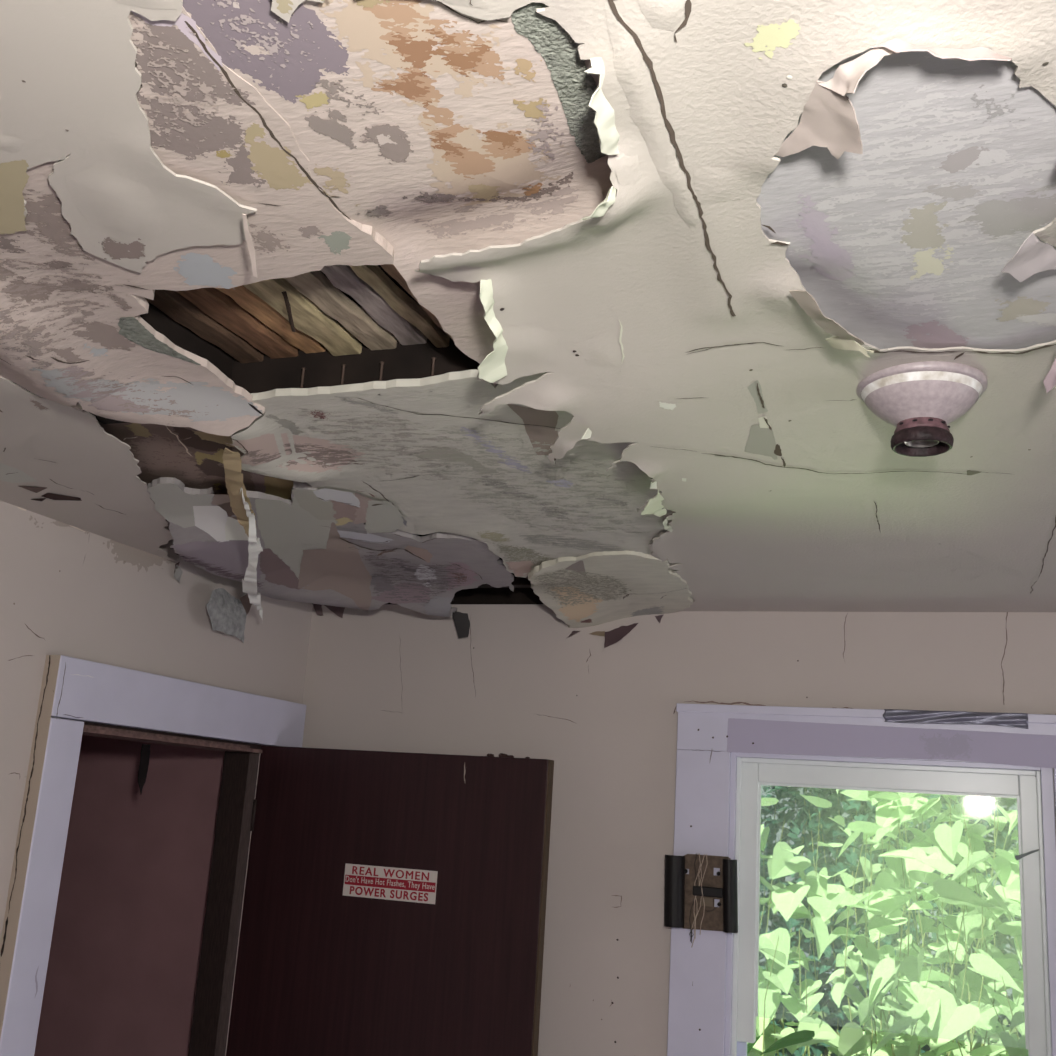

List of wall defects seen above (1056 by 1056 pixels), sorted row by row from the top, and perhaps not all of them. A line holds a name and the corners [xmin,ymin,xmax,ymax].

crack [608,0,736,317]
crack [763,225,789,246]
flaking render [756,48,1056,349]
flaking render [0,0,694,628]
crack [685,342,821,355]
crack [1030,517,1056,593]
crack [1000,612,1008,703]